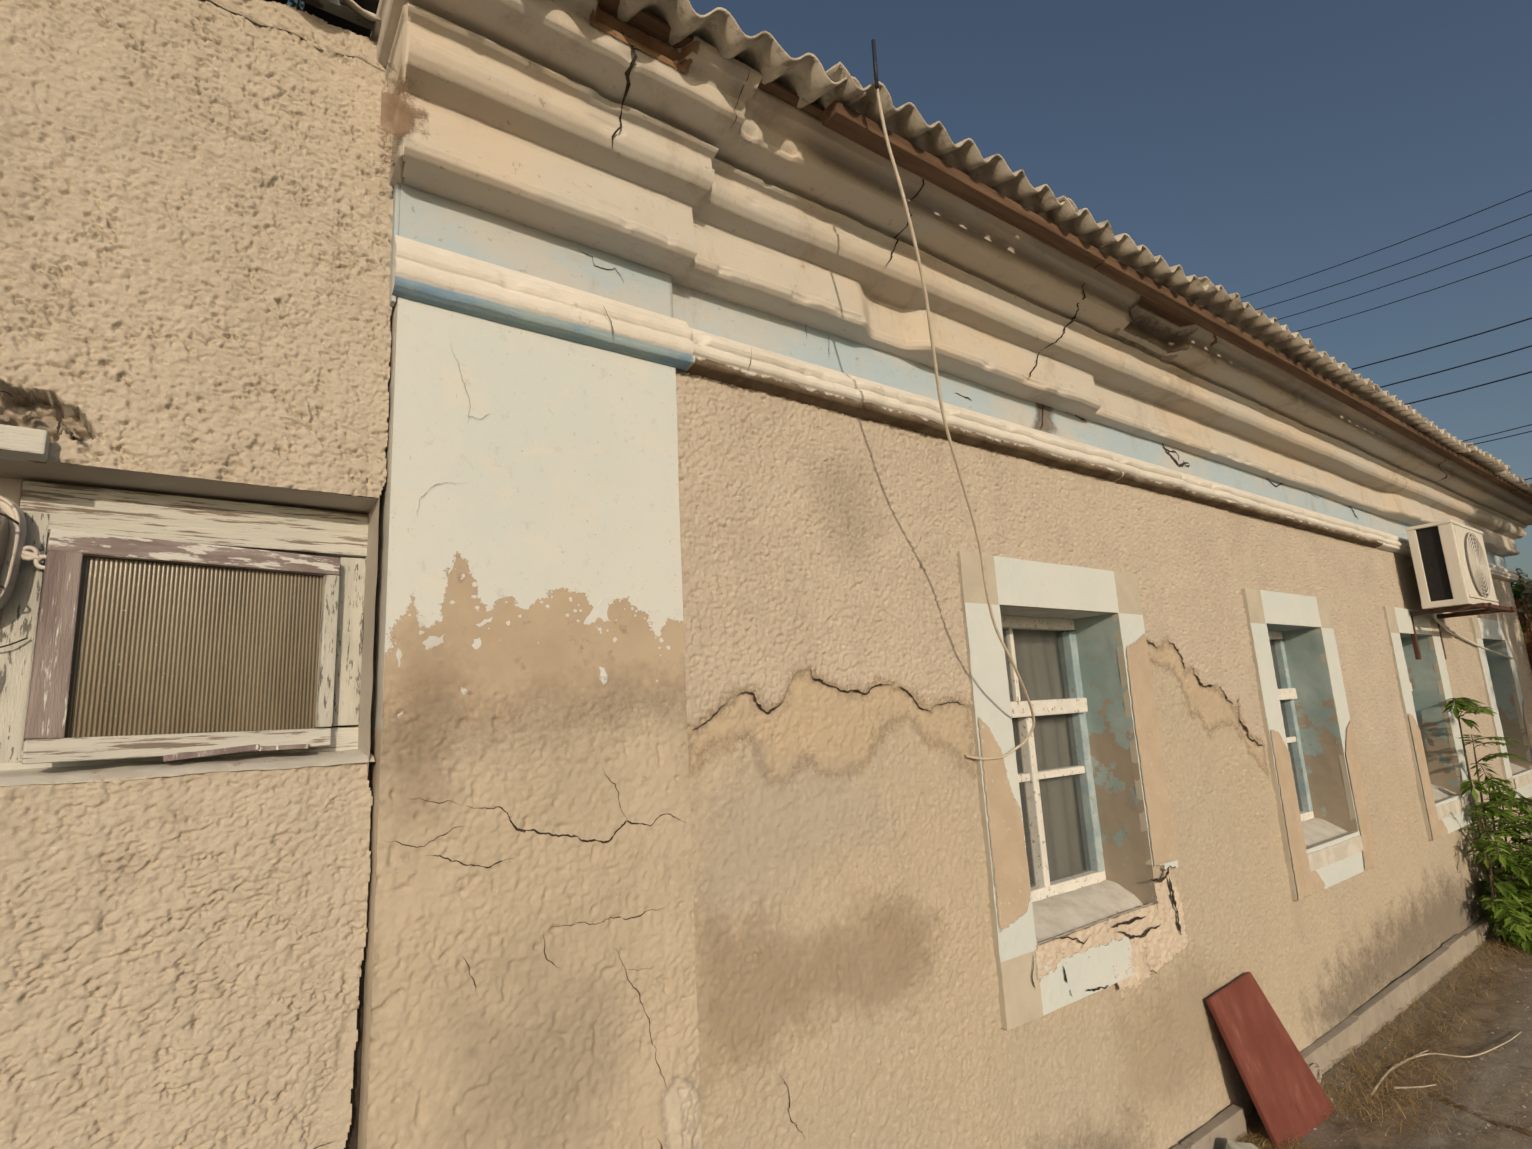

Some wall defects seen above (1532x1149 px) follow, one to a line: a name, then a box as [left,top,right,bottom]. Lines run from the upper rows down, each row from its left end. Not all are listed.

crack [612,29,638,148]
crack [885,179,924,267]
crack [1029,283,1086,378]
flaking render [0,379,93,443]
peeling [367,551,1031,1149]
flaking render [1035,634,1325,991]
crack [1429,1095,1532,1137]